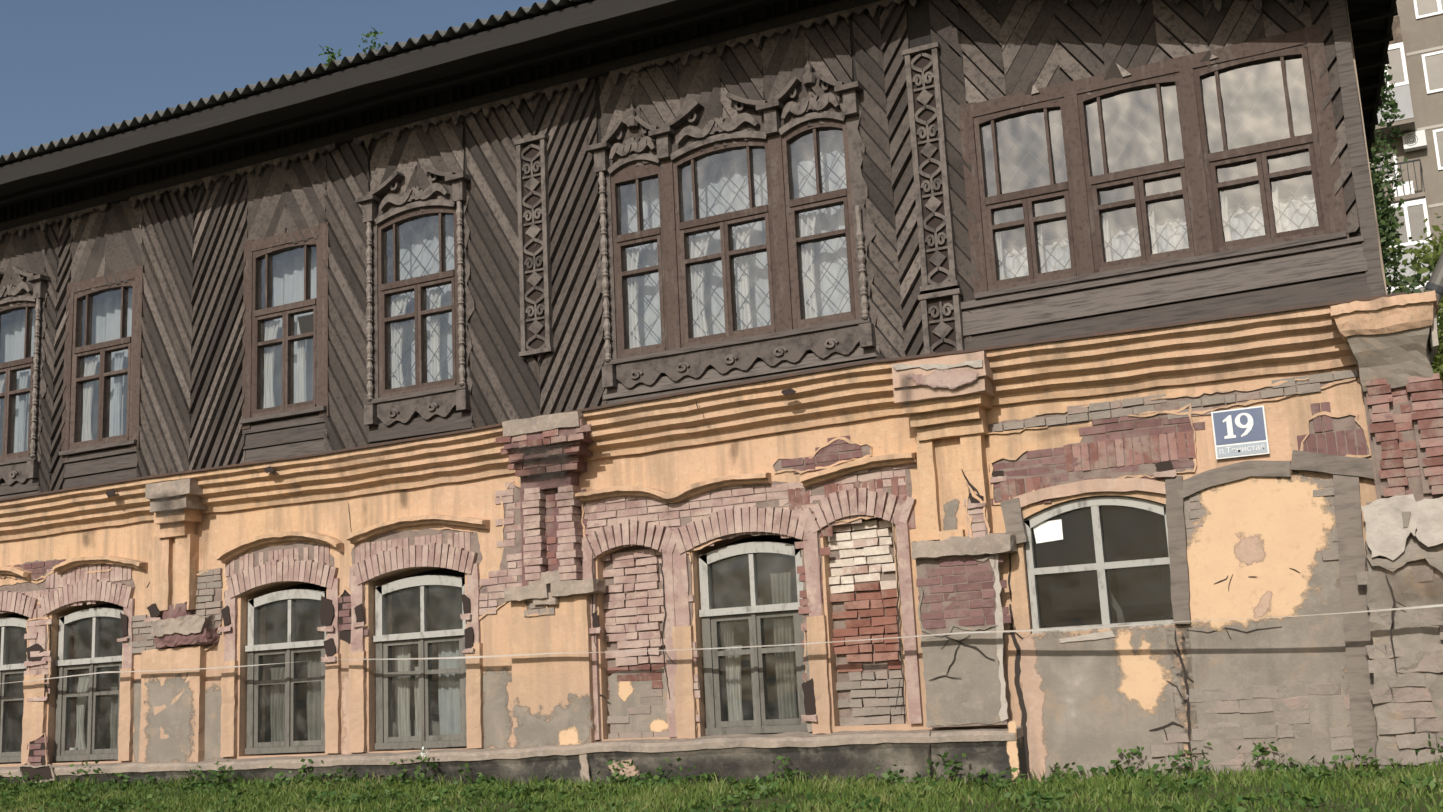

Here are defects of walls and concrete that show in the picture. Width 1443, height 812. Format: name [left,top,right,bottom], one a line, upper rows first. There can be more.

spalling [0,559,136,702]
spalling [117,481,555,762]
peeling [483,667,593,749]
spalling [579,435,917,729]
crack [893,522,1032,780]
spalling [916,554,1011,637]
peeling [1018,635,1048,782]
spalling [943,369,1371,540]
spalling [1150,682,1354,776]
spalling [1302,478,1339,560]
spalling [1364,608,1443,765]
peeling [1402,496,1443,547]